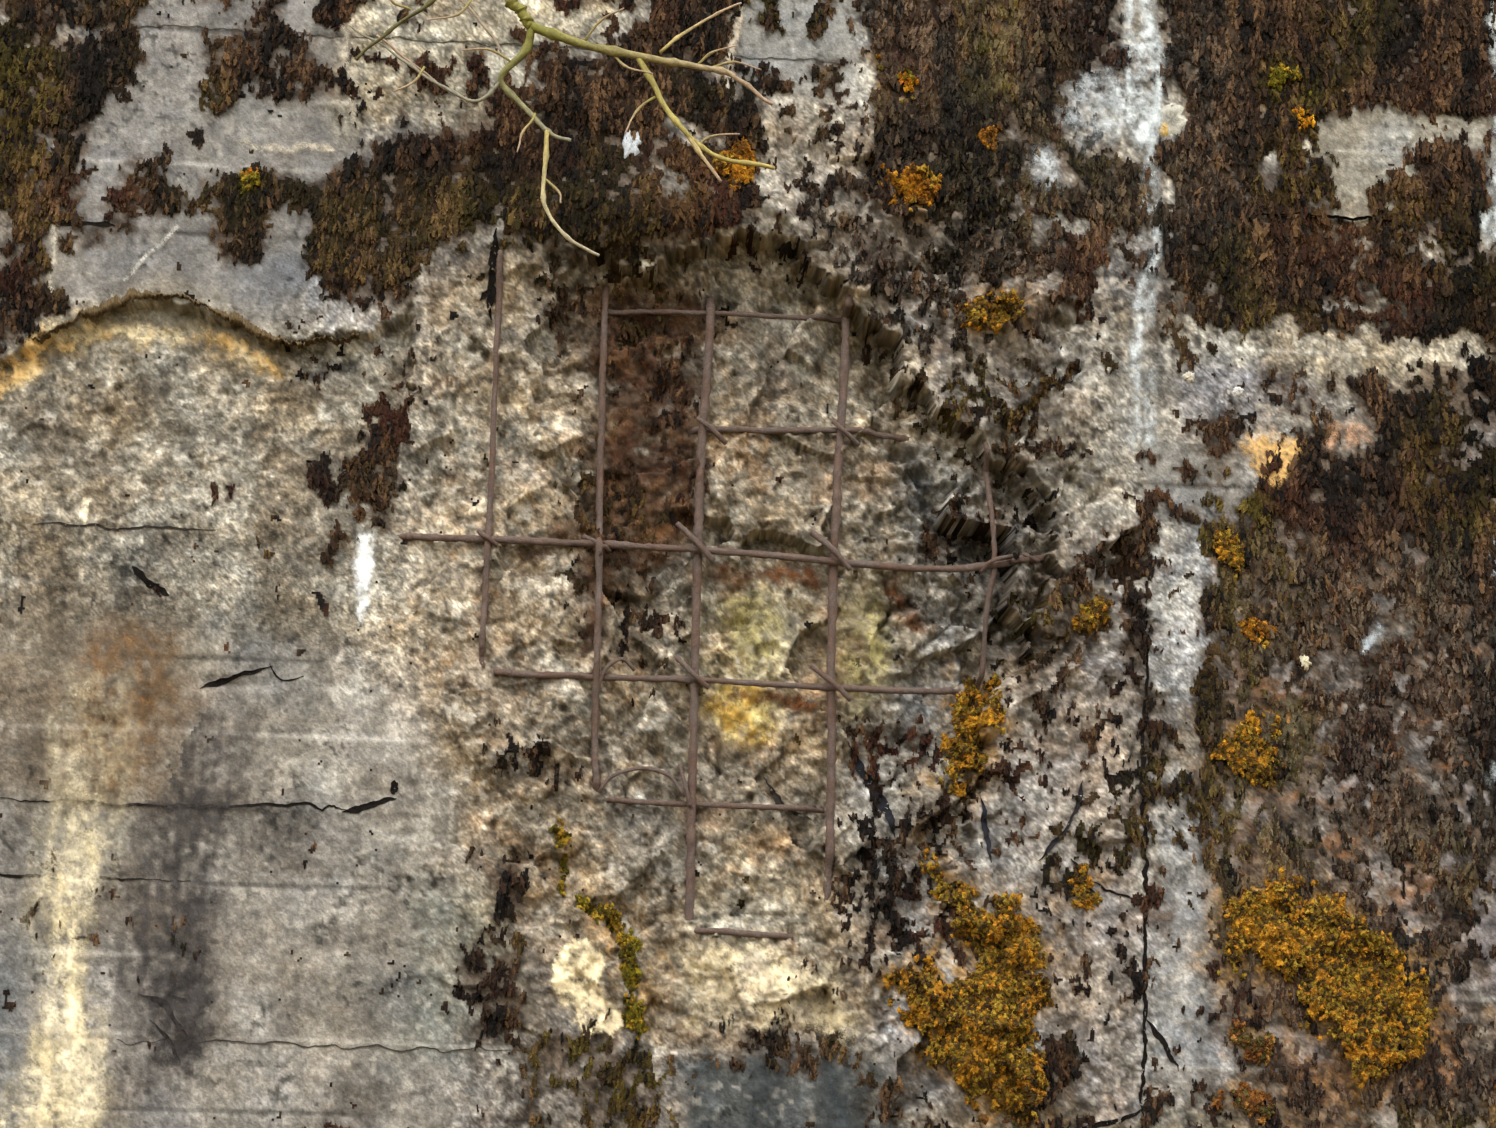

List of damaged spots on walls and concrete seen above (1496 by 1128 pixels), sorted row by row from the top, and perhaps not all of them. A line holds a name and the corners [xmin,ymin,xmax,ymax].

water stain [1040,151,1057,187]
water stain [1070,0,1163,161]
water stain [1131,200,1160,442]
water stain [1,809,105,1128]
crack [0,874,191,882]
water stain [55,633,257,1091]
crack [0,780,398,814]
spalling [0,233,1064,1070]
rust [583,287,707,650]
rust [716,565,820,588]
rust [733,692,816,710]
crack [1038,552,1179,1128]